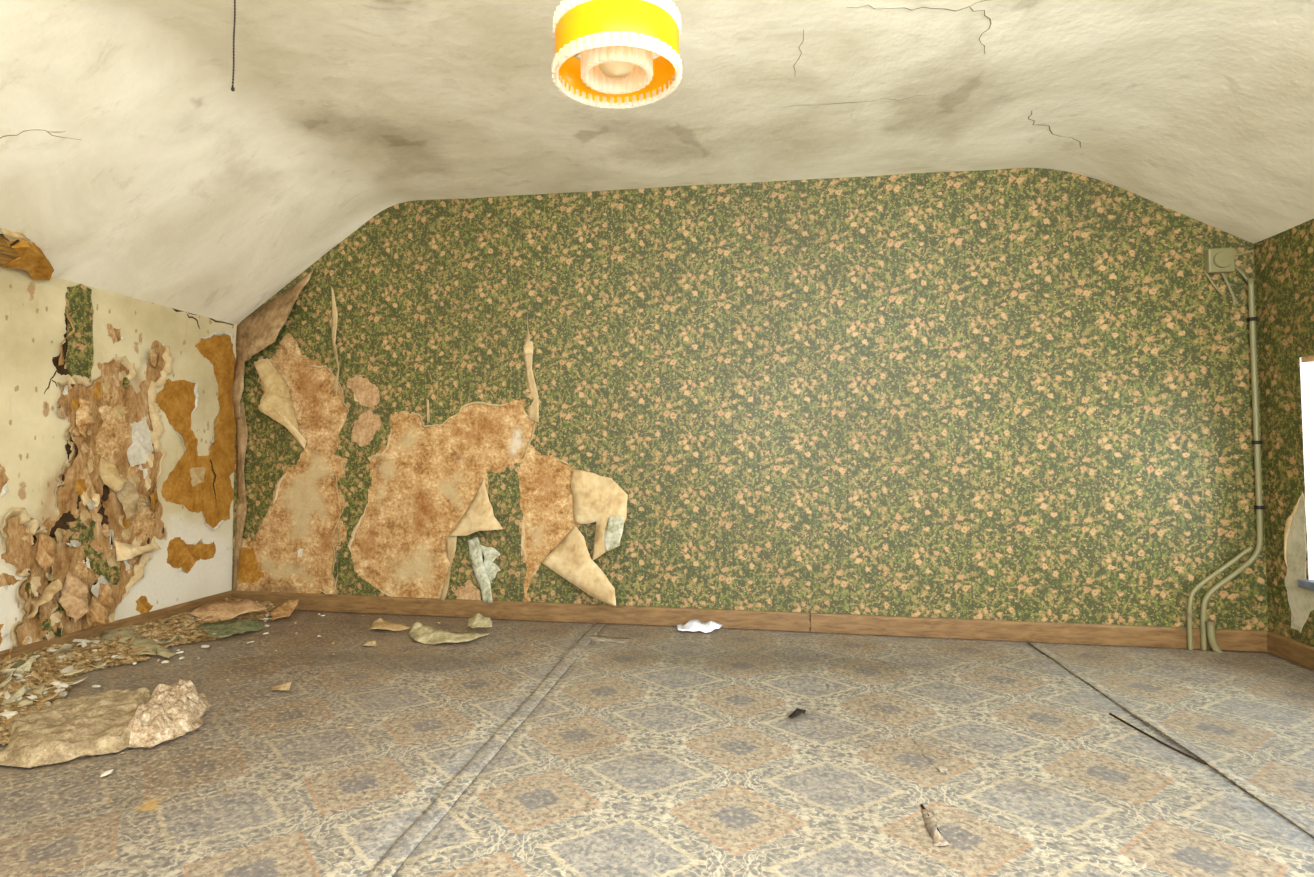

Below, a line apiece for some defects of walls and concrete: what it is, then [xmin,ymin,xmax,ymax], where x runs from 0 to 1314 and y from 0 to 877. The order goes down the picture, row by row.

crack [846,0,992,55]
crack [0,129,82,140]
flaking render [0,228,54,280]
peeling [107,323,125,343]
peeling [0,464,9,498]
peeling [55,331,236,598]
flaking render [368,412,428,518]
flaking render [504,421,530,465]
flaking render [256,441,340,594]
flaking render [376,538,450,598]
peeling [0,557,71,659]
peeling [136,596,153,614]